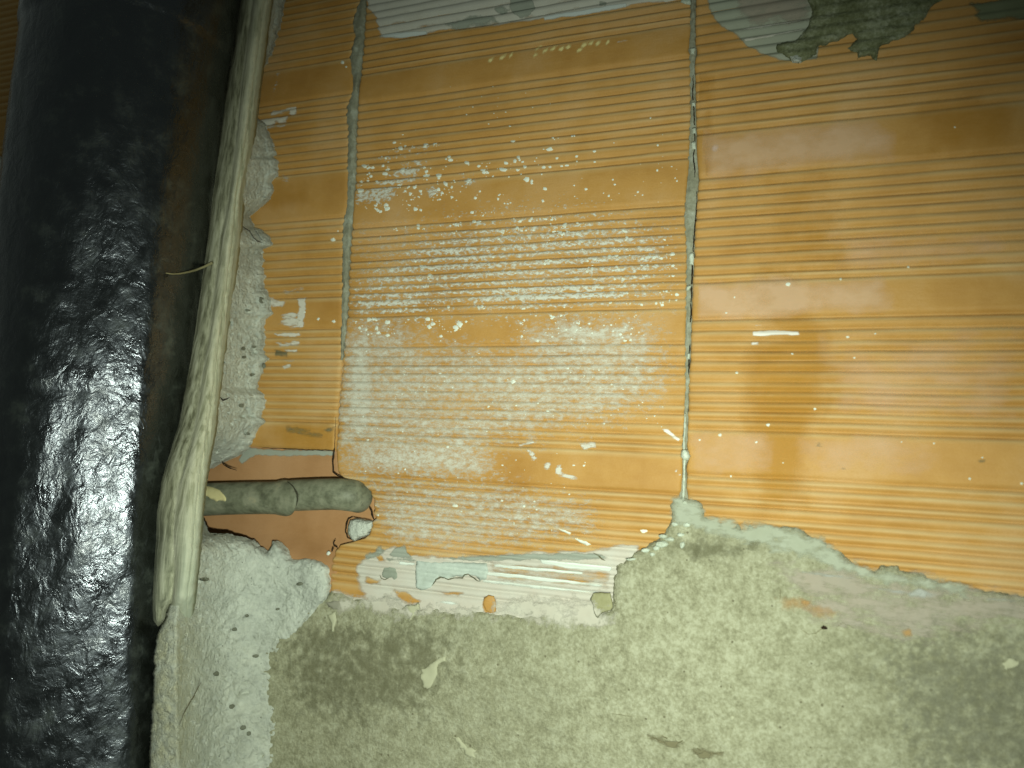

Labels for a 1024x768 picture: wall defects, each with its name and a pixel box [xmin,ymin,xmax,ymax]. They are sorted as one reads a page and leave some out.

peeling [367,0,674,38]
water stain [356,146,429,204]
crack [688,81,697,375]
water stain [287,203,668,548]
spalling [206,432,347,501]
peeling [204,498,638,632]